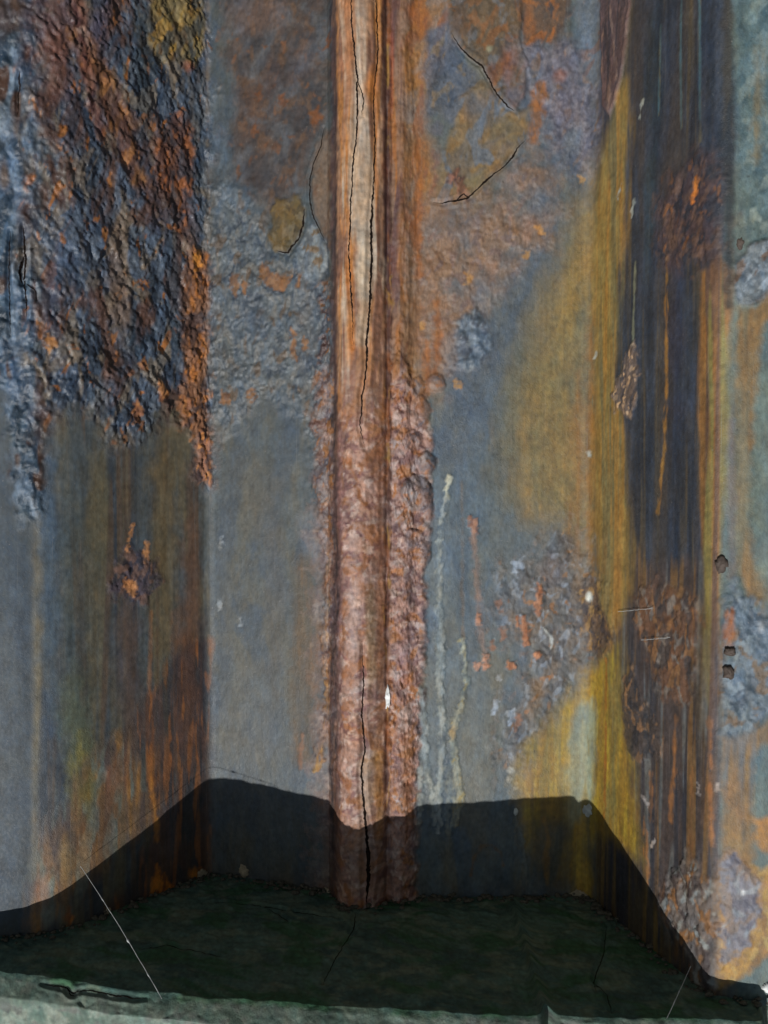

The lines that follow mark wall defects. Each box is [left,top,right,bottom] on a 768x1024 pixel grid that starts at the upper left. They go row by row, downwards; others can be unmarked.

rust [42,332,59,356]
rust [20,522,217,935]
rust [61,0,232,490]
rust [228,261,302,300]
crack [276,0,379,447]
rust [306,0,447,901]
crack [433,138,527,204]
crack [453,36,514,111]
rust [466,514,510,672]
rust [487,0,768,998]